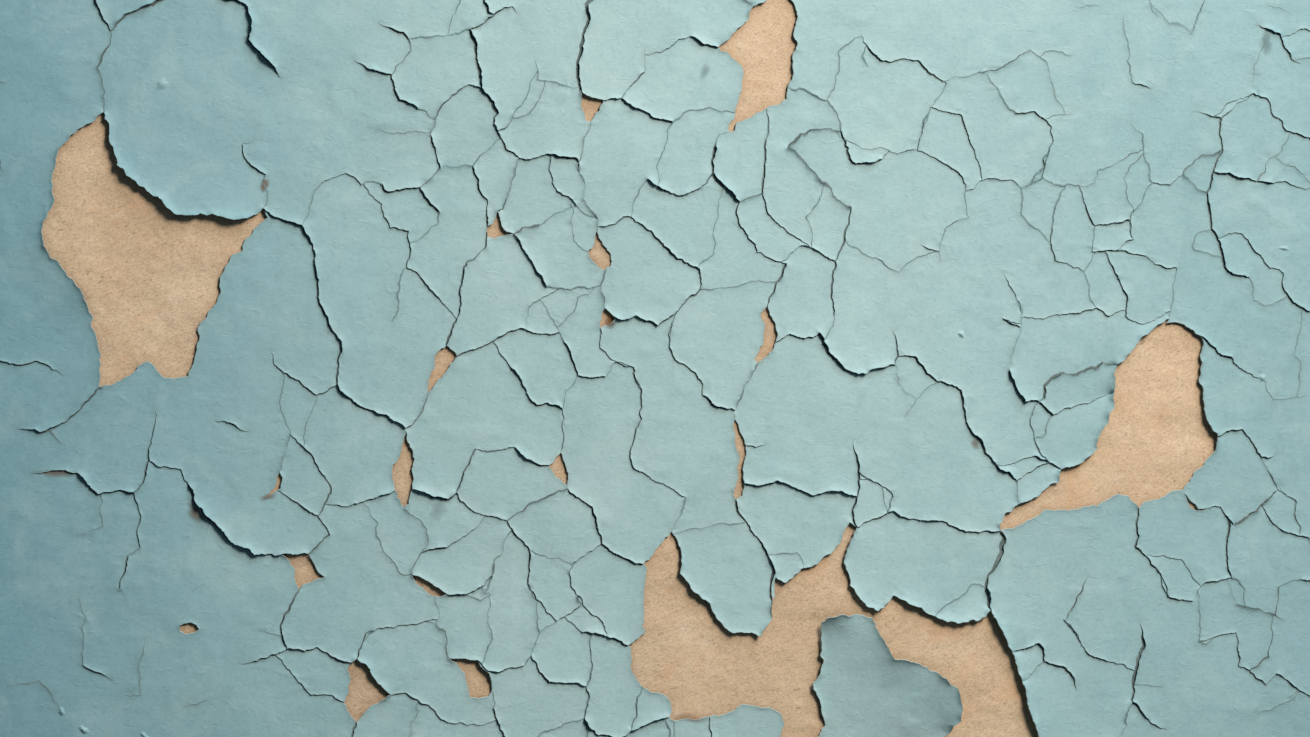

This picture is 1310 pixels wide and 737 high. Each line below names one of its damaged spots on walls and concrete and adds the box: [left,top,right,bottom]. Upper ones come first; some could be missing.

crack [227,0,283,77]
peeling [716,0,804,134]
peeling [34,106,275,386]
crack [242,0,1310,616]
crack [21,383,282,594]
crack [246,587,449,703]
peeling [343,651,398,723]
peeling [442,651,497,698]
peeling [630,516,1044,737]
crack [1014,578,1164,737]
peeling [993,312,1222,533]
crack [1134,425,1310,712]